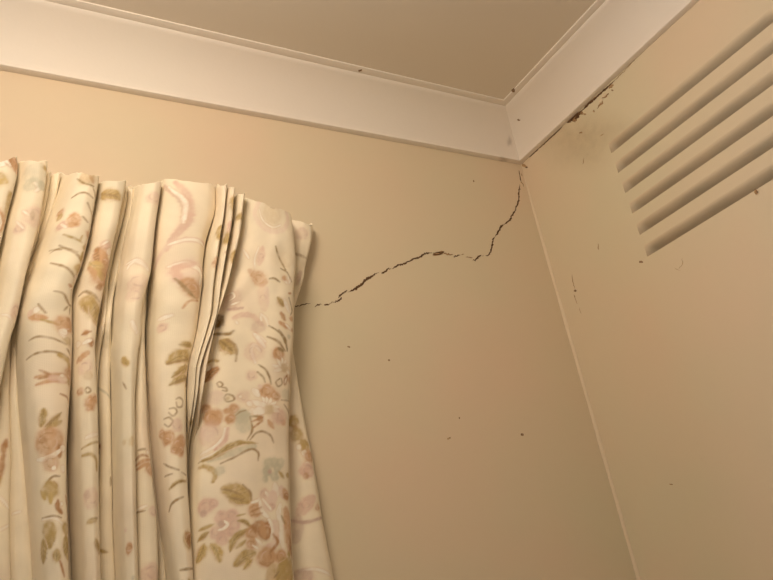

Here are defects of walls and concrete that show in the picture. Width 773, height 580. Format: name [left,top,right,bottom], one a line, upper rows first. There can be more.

crack [295,60,635,307]